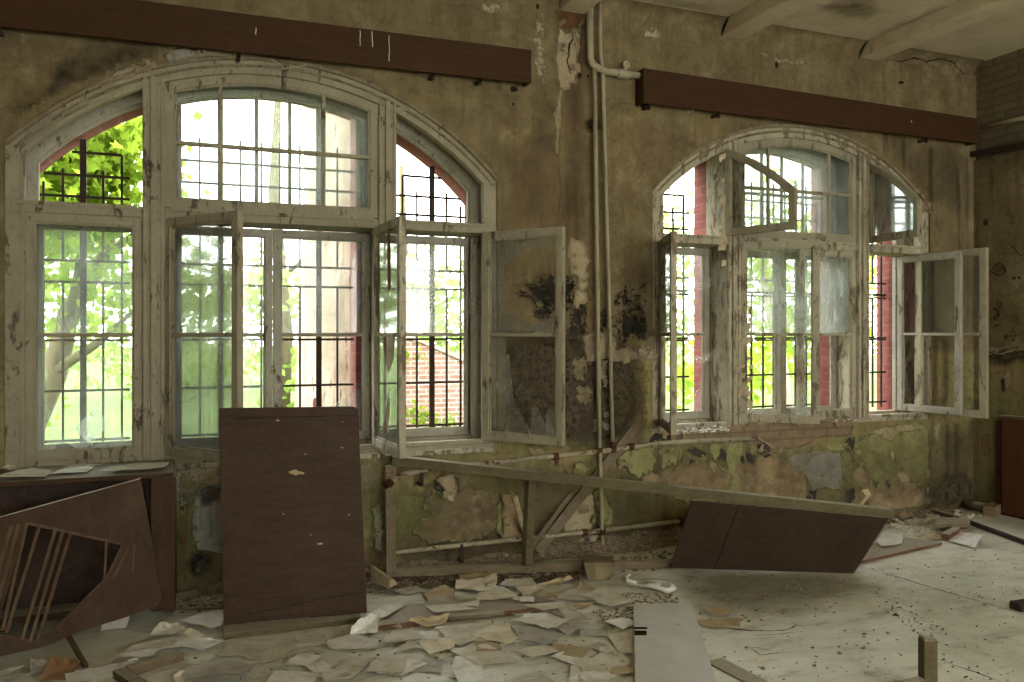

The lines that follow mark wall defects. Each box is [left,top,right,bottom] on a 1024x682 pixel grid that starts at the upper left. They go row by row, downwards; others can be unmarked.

flaking render [553,3,589,154]
crack [889,57,968,74]
flaking render [568,236,591,308]
water stain [505,273,647,442]
peeling [616,418,940,510]
flaking render [190,482,222,555]
peeling [411,472,505,545]